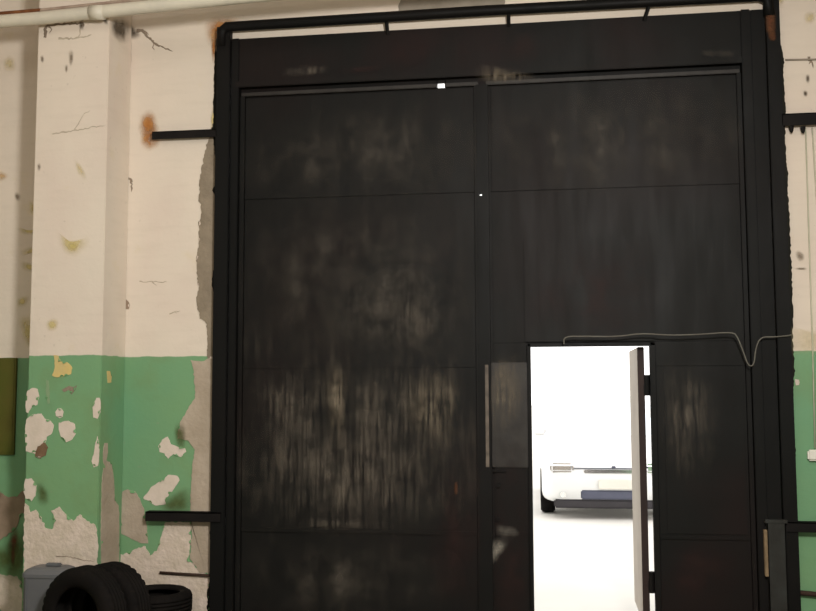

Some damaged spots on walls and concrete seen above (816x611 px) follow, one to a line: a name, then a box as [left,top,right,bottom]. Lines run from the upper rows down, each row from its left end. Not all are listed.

spalling [398,0,505,11]
crack [43,22,92,40]
crack [136,29,171,51]
rust [211,21,229,56]
rust [767,15,775,39]
crack [52,112,105,134]
rust [143,116,155,145]
spalling [158,137,215,511]
peeling [52,355,72,377]
peeling [93,398,101,419]
peeling [25,388,76,459]
peeling [0,436,210,611]